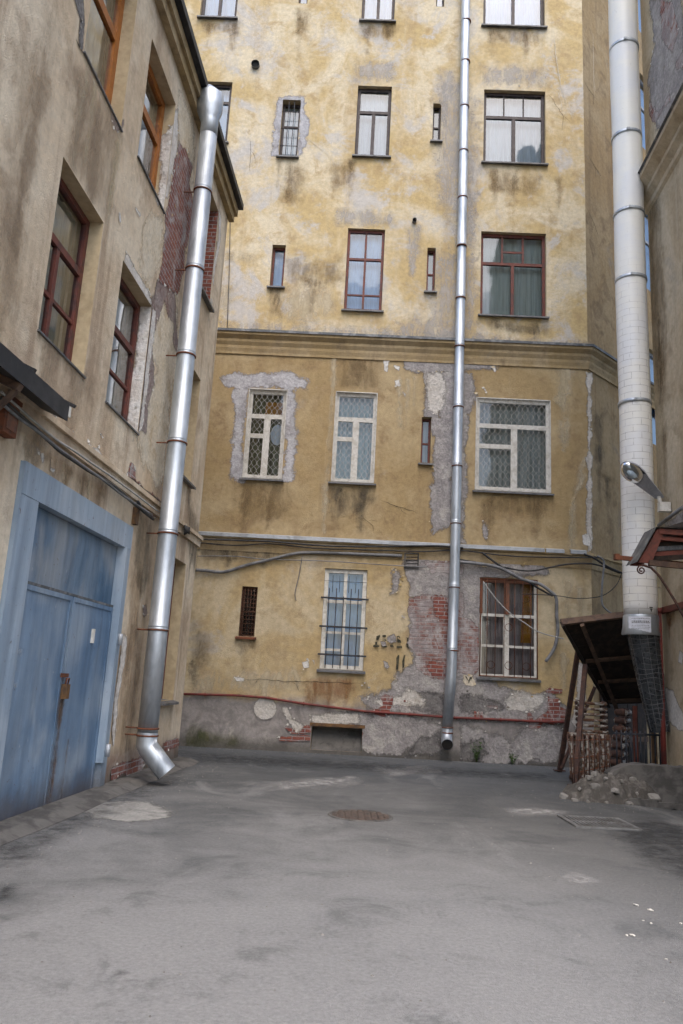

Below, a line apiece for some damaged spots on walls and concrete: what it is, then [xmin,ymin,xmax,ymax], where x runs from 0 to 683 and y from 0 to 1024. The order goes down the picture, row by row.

flaking render [647,0,683,130]
flaking render [125,90,194,503]
flaking render [383,360,497,544]
flaking render [582,371,593,552]
flaking render [277,559,587,765]